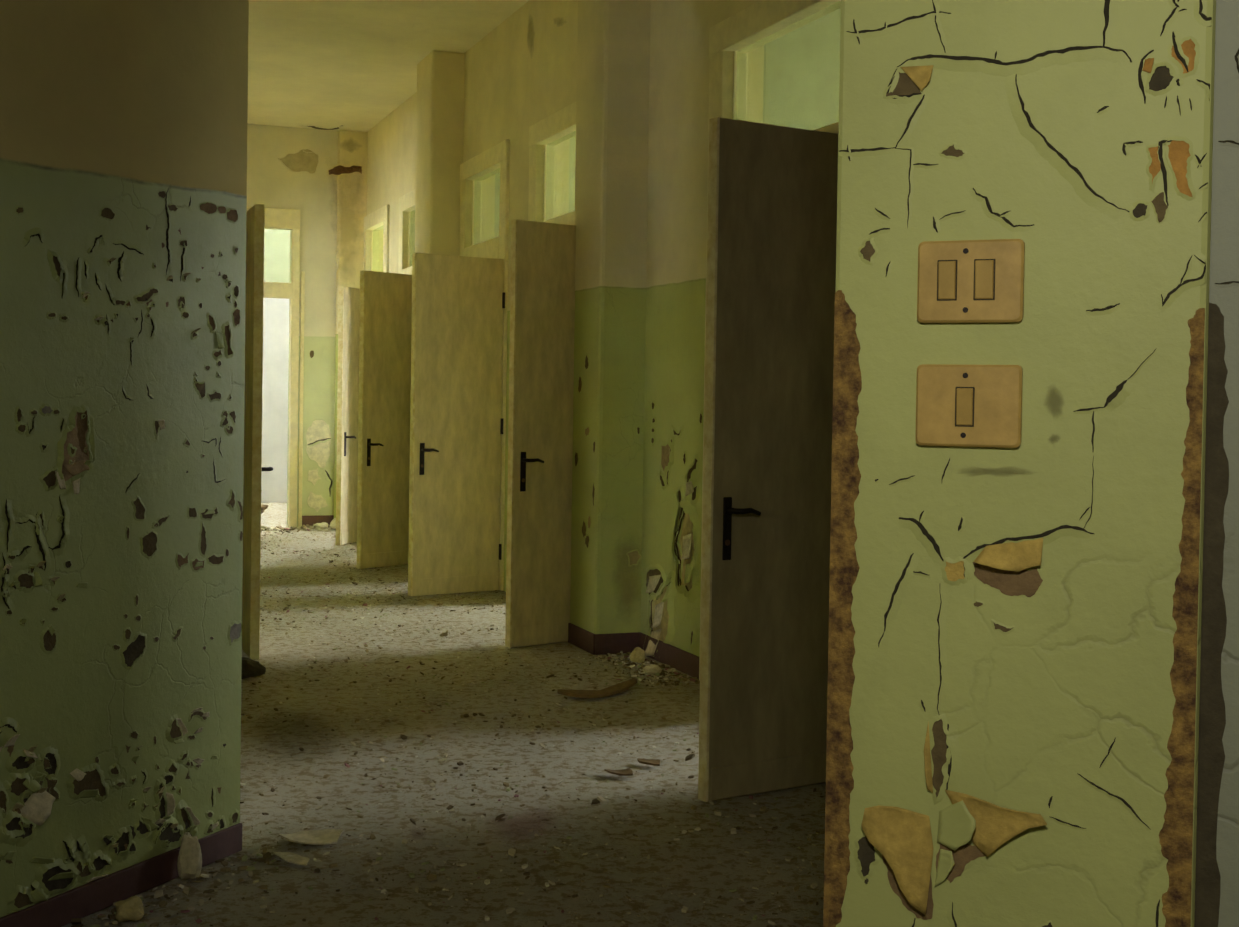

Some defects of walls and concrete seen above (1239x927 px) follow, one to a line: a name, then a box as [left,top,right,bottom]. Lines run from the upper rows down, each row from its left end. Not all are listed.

crack [839,0,1132,233]
spalling [1122,136,1196,224]
spalling [1138,31,1210,104]
crack [1160,0,1212,38]
crack [1156,140,1239,312]
peeling [94,245,241,437]
crack [1073,348,1158,529]
crack [878,553,949,721]
spalling [823,290,1095,927]
spalling [1155,303,1229,927]
peeling [0,708,240,914]
crack [1076,737,1151,831]